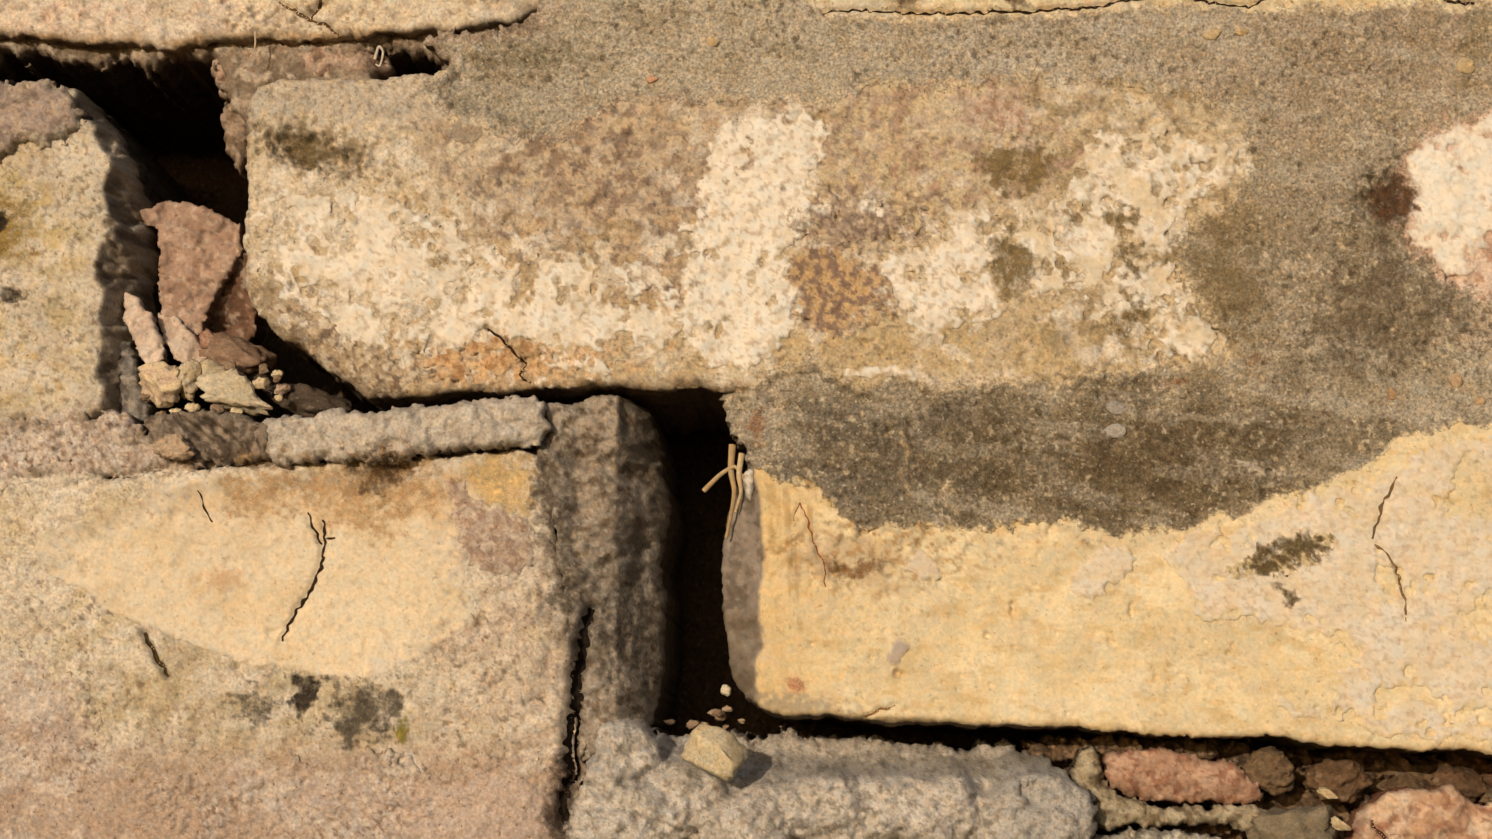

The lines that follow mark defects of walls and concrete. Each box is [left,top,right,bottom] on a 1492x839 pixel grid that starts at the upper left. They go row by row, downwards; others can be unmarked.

crack [823,0,1141,16]
crack [1194,0,1264,9]
crack [1444,0,1475,8]
peeling [122,292,207,363]
crack [282,512,335,641]
crack [144,632,170,678]
crack [558,607,595,825]